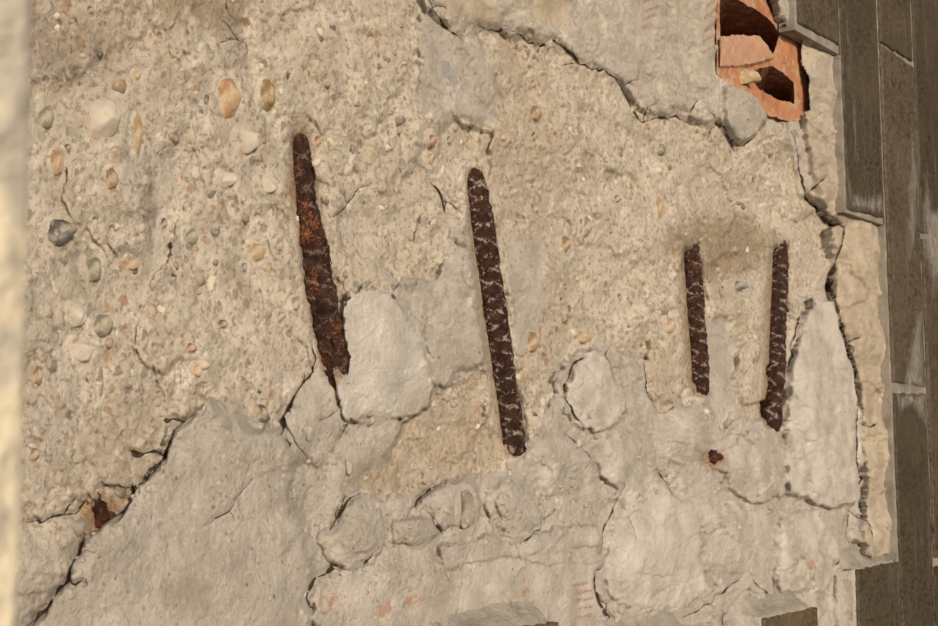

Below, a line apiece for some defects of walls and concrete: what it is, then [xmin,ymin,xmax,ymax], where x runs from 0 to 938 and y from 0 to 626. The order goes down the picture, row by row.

crack [429,0,752,152]
crack [786,124,878,536]
crack [26,497,88,524]
crack [115,414,193,516]
crack [27,578,82,626]
crack [681,578,775,626]